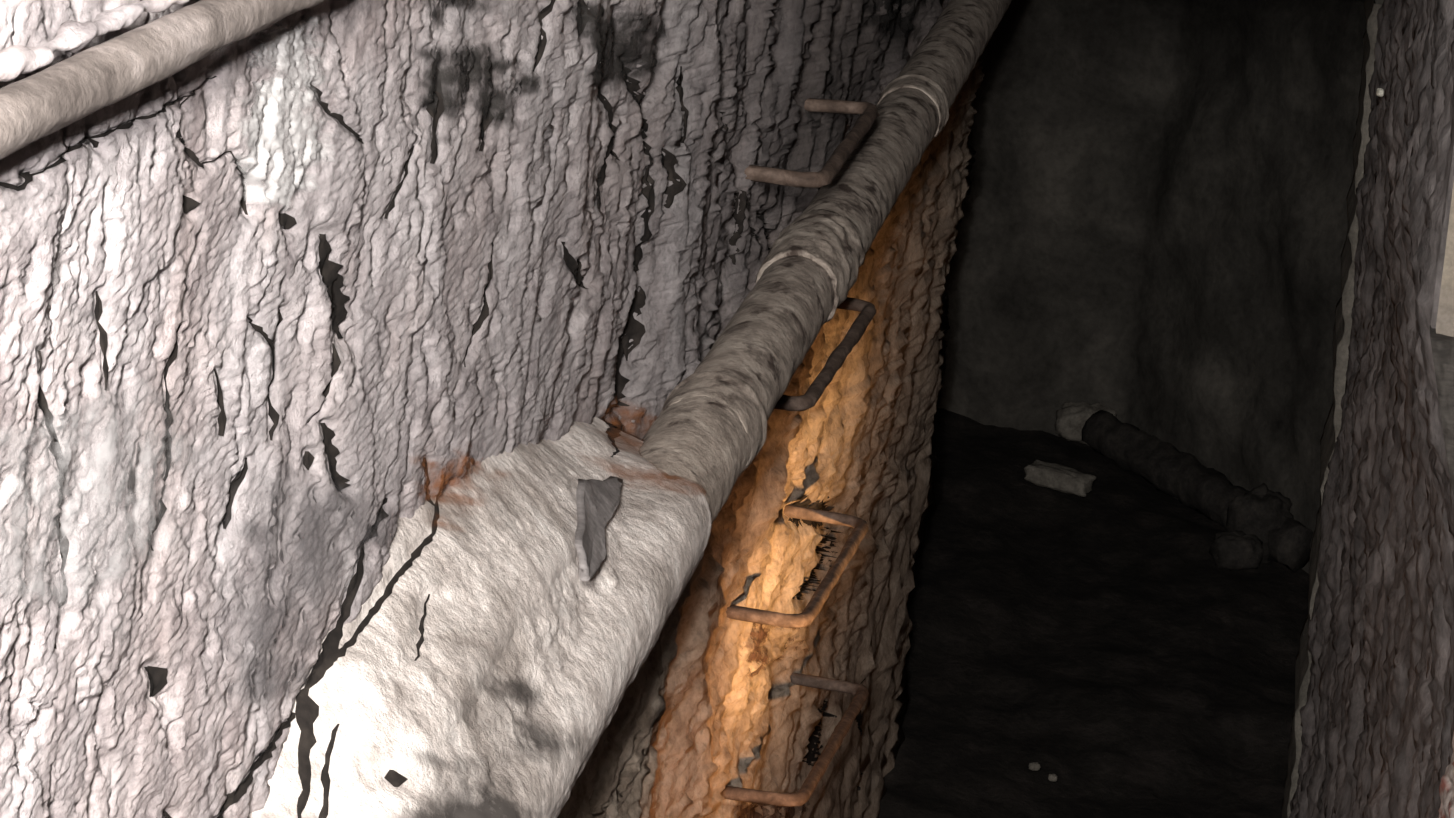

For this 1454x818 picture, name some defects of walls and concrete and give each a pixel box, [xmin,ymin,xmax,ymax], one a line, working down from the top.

crack [217,457,453,818]
flaking render [575,476,623,581]